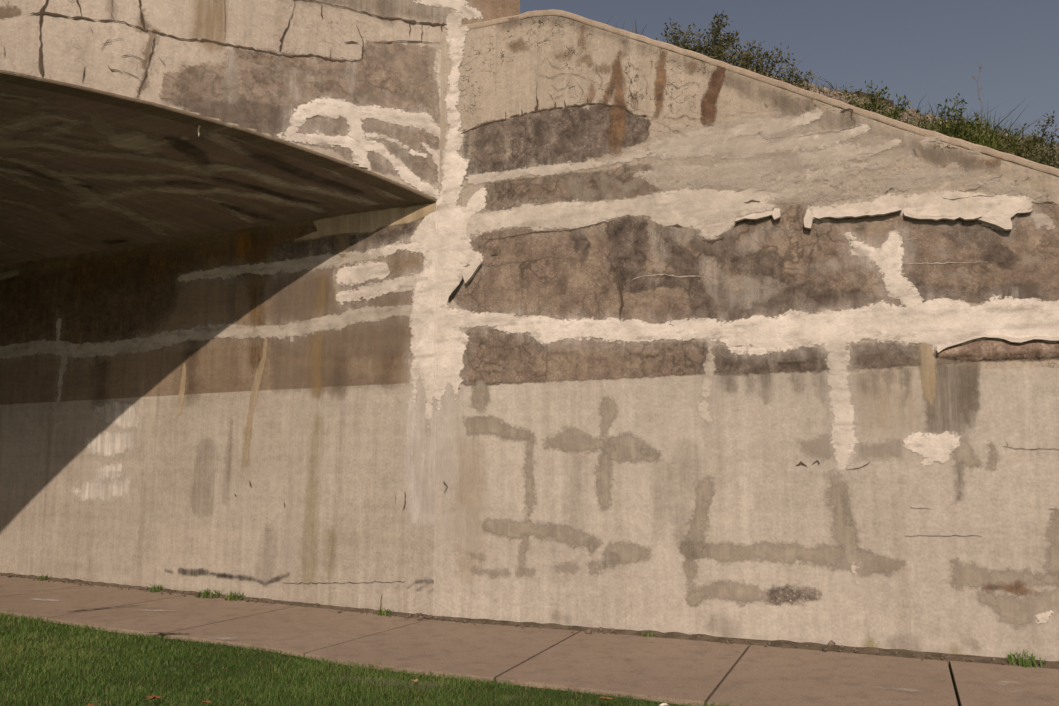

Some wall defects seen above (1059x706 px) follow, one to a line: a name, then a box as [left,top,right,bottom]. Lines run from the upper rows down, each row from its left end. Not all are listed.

crack [30,0,447,96]
crack [461,21,701,136]
corrosion [593,51,626,155]
corrosion [654,51,666,117]
corrosion [701,66,725,127]
spalling [448,103,1059,325]
spalling [460,327,828,386]
water stain [714,346,831,375]
peeling [899,335,1059,366]
water stain [844,341,998,498]
water stain [465,380,659,578]
water stain [680,473,905,607]